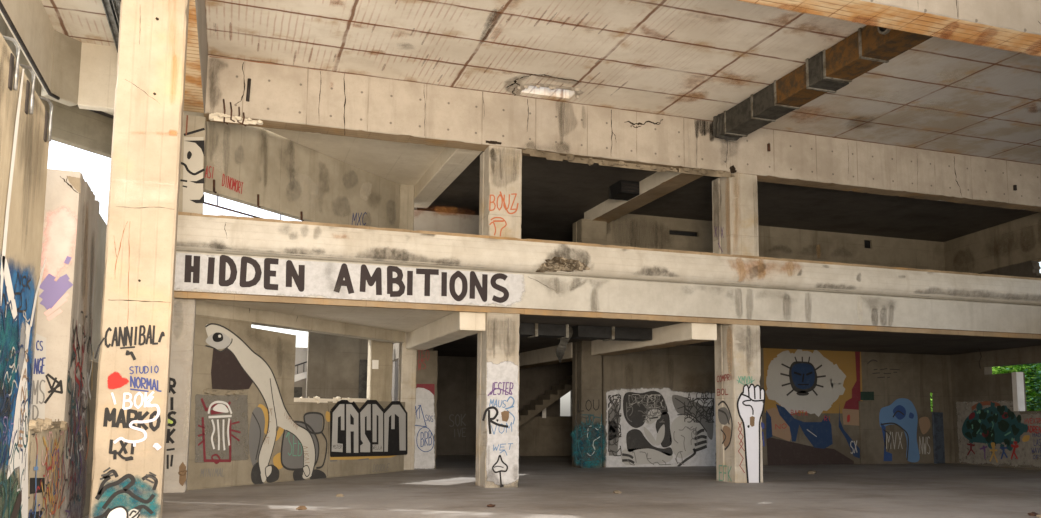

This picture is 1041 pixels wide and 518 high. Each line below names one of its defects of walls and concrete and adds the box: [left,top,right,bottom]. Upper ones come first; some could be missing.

crack [439,2,712,47]
crack [209,0,645,135]
spalling [516,83,584,99]
spalling [209,99,263,126]
crack [611,110,663,150]
spalling [536,257,590,273]